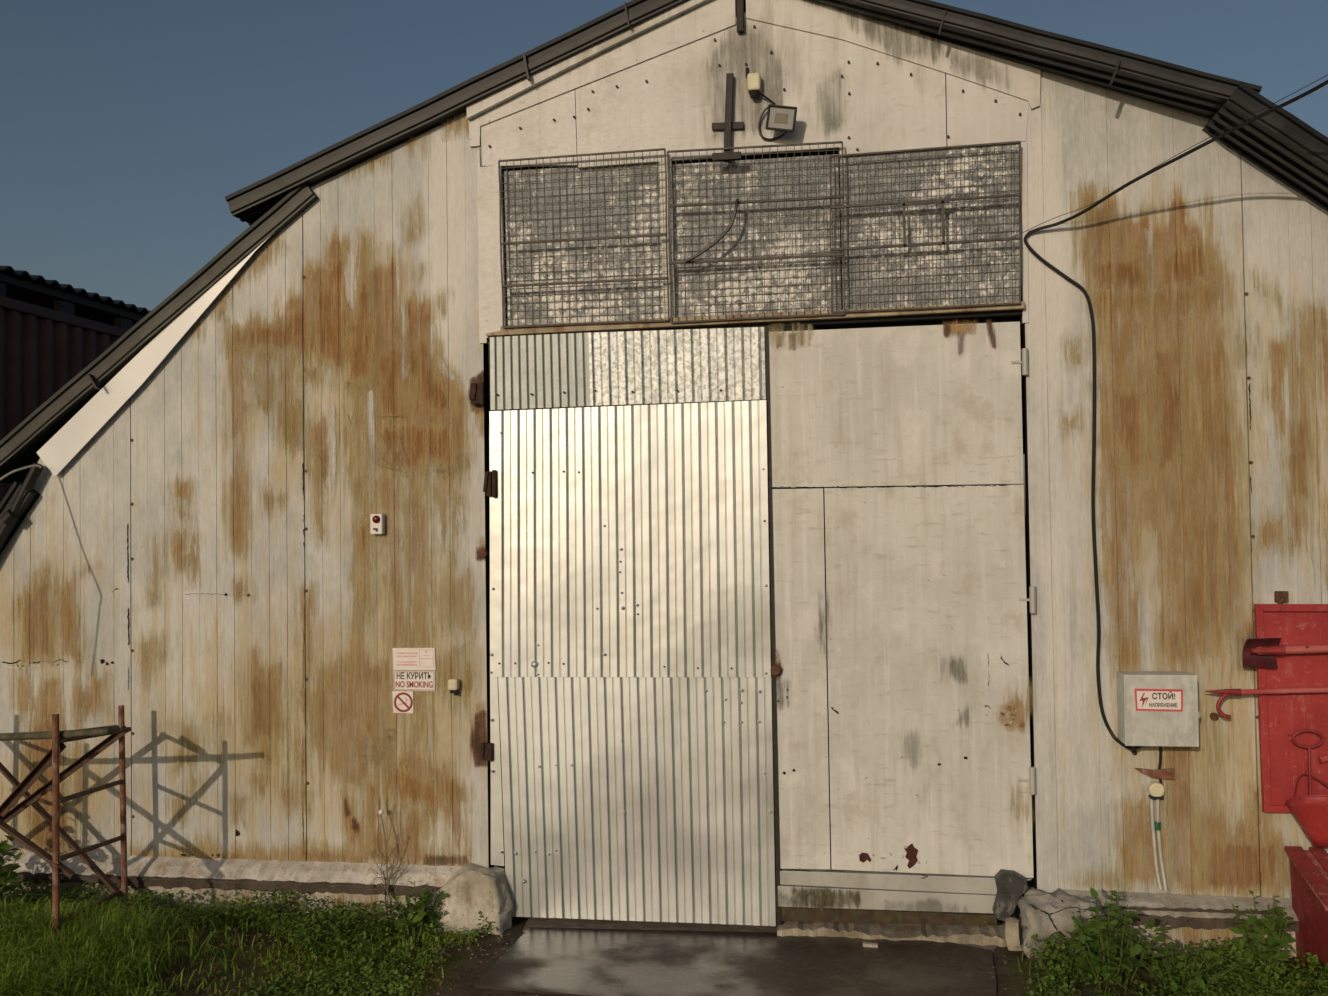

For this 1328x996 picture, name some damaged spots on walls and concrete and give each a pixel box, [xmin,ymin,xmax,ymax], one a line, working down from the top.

rust [129,197,488,866]
rust [943,320,996,351]
rust [1062,187,1328,680]
rust [11,563,108,854]
peeling [859,844,920,869]
rust [1083,721,1291,898]